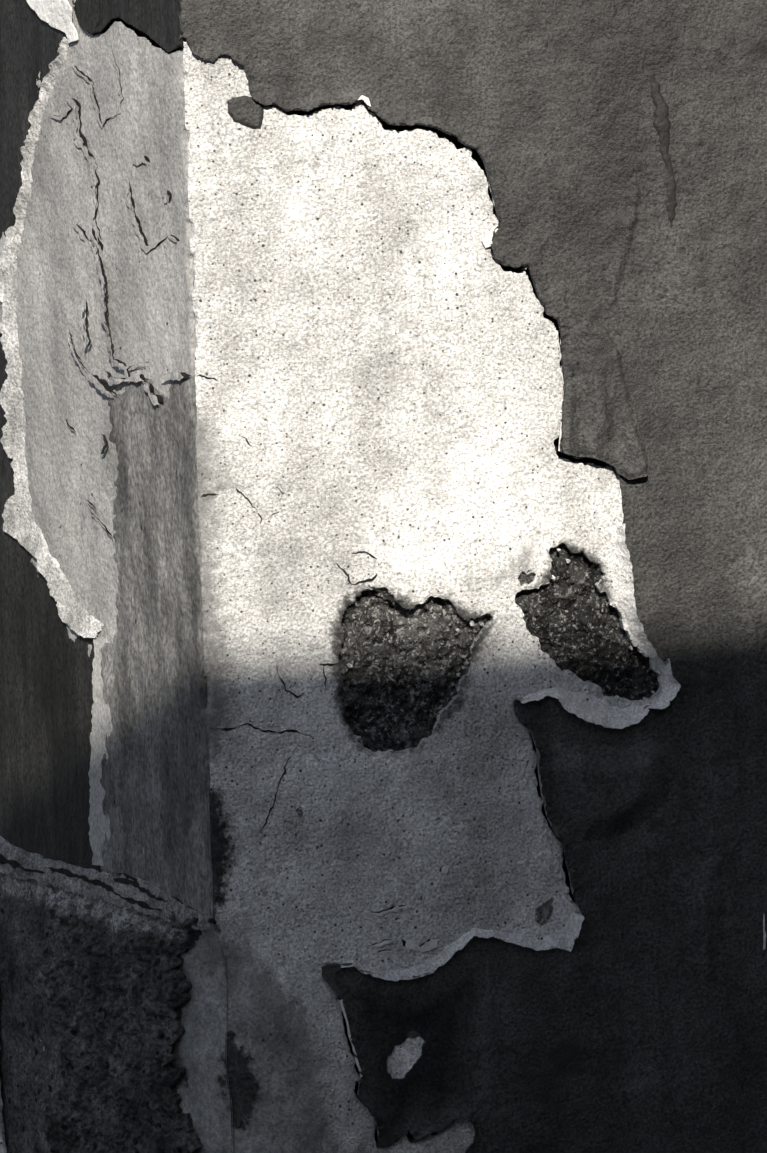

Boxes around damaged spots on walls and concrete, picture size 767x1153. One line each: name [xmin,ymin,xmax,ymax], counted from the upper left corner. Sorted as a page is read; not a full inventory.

crack [50,52,217,405]
crack [66,419,108,454]
crack [85,499,113,539]
peeling [0,0,214,917]
peeling [182,38,681,1153]
spalling [0,872,202,1153]